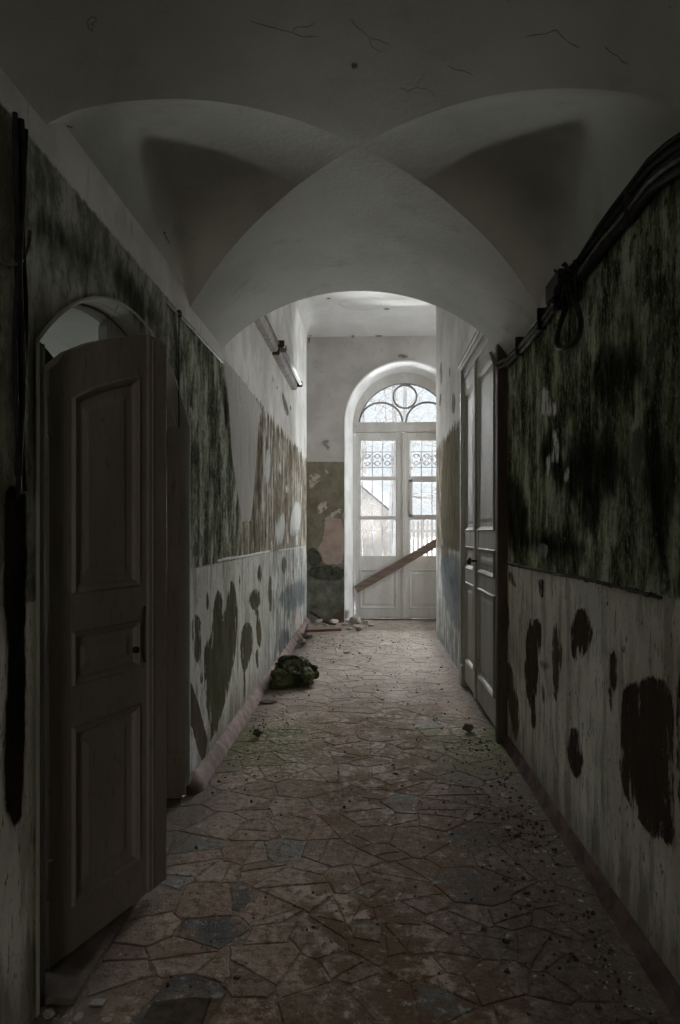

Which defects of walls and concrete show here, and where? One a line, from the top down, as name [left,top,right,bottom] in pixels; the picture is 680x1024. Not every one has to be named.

water stain [114,265,155,328]
spalling [217,449,344,565]
water stain [507,426,620,559]
water stain [642,436,675,571]
water stain [192,566,272,738]
water stain [507,608,593,741]
water stain [566,727,584,778]
water stain [608,647,680,845]